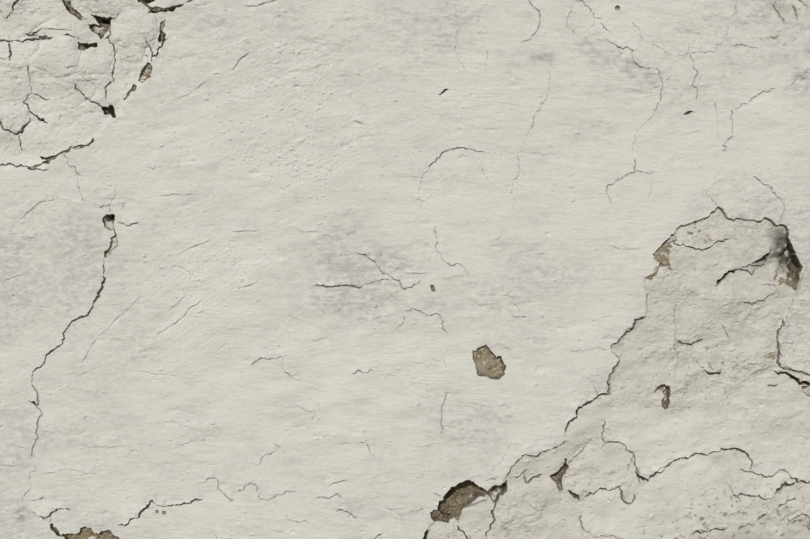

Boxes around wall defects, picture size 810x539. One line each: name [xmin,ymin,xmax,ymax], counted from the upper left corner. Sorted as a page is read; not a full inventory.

peeling [0,0,196,171]
crack [417,68,565,215]
crack [520,0,542,44]
crack [566,0,810,208]
crack [750,175,786,225]
crack [21,258,106,525]
crack [312,225,470,436]
crack [501,294,528,319]
peeling [422,206,810,539]
spalling [50,523,120,539]